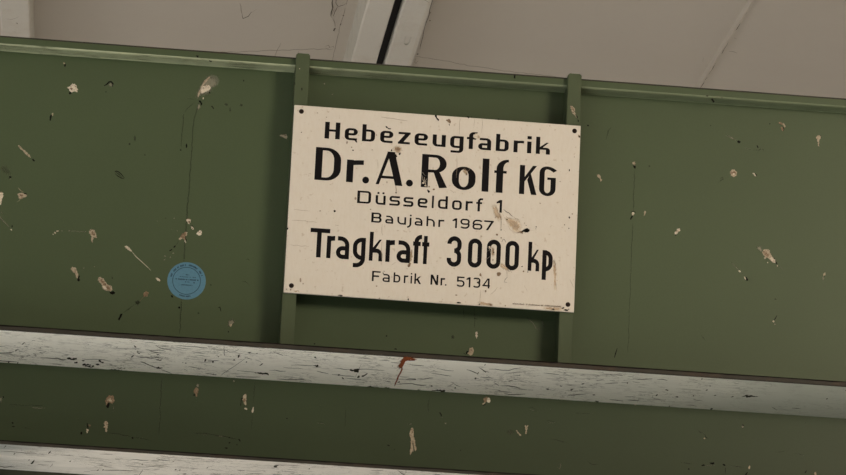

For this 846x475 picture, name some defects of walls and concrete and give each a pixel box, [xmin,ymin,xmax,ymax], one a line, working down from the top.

peeling [758,247,778,267]
peeling [98,277,115,295]
corrosion [395,357,416,385]